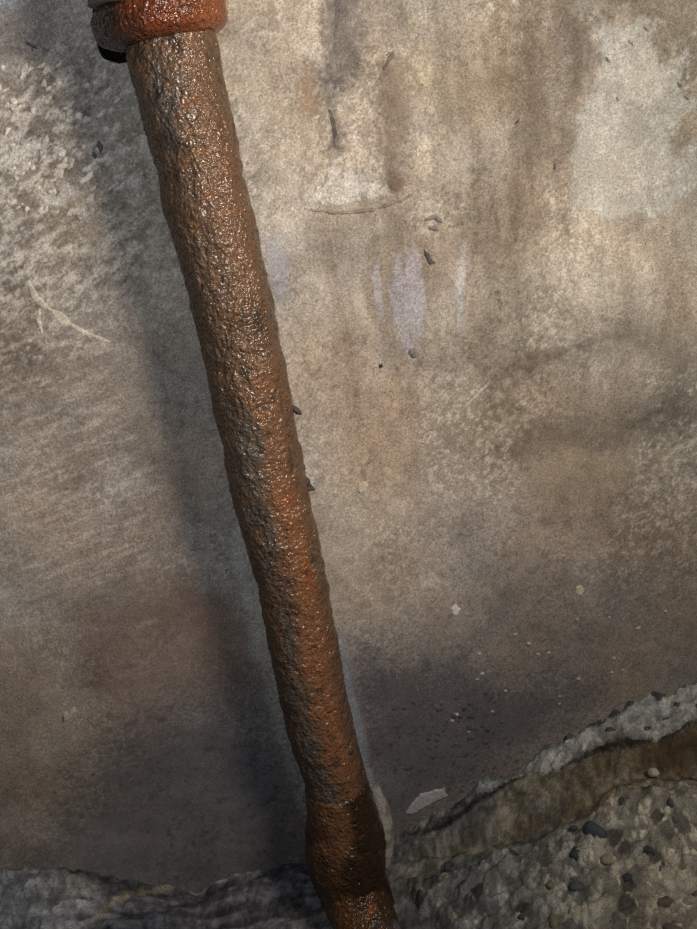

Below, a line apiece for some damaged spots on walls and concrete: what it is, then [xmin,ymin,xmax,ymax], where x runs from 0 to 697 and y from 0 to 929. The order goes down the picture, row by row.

damp [321,0,363,112]
damp [371,251,427,353]
damp [455,242,467,328]
damp [38,685,305,893]
damp [359,670,582,835]
spalling [405,768,697,929]
flaking render [469,682,697,801]